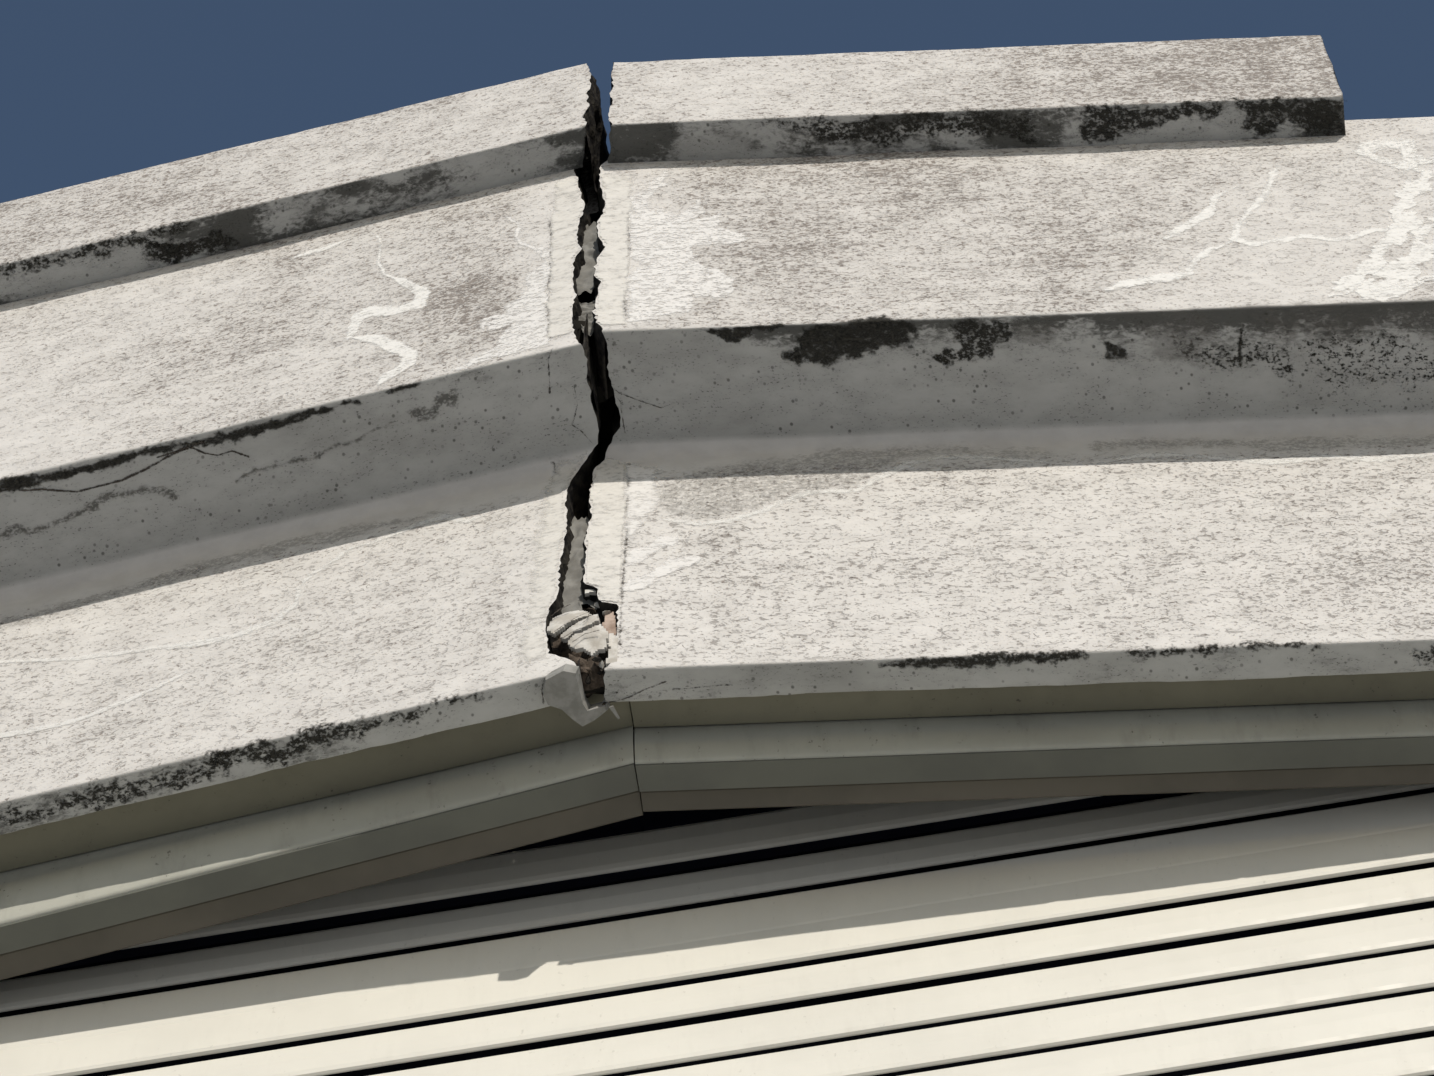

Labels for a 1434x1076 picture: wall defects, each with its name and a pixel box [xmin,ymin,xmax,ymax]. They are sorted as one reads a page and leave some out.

leakage [762,108,1036,148]
leakage [1079,96,1346,144]
leakage [1104,138,1434,302]
leakage [707,323,785,343]
leakage [781,315,922,366]
crack [20,441,249,493]
leakage [0,400,361,492]
crack [541,167,728,702]
spalling [543,589,620,726]
leakage [879,650,1088,669]
leakage [1128,641,1317,660]
leakage [0,693,492,826]